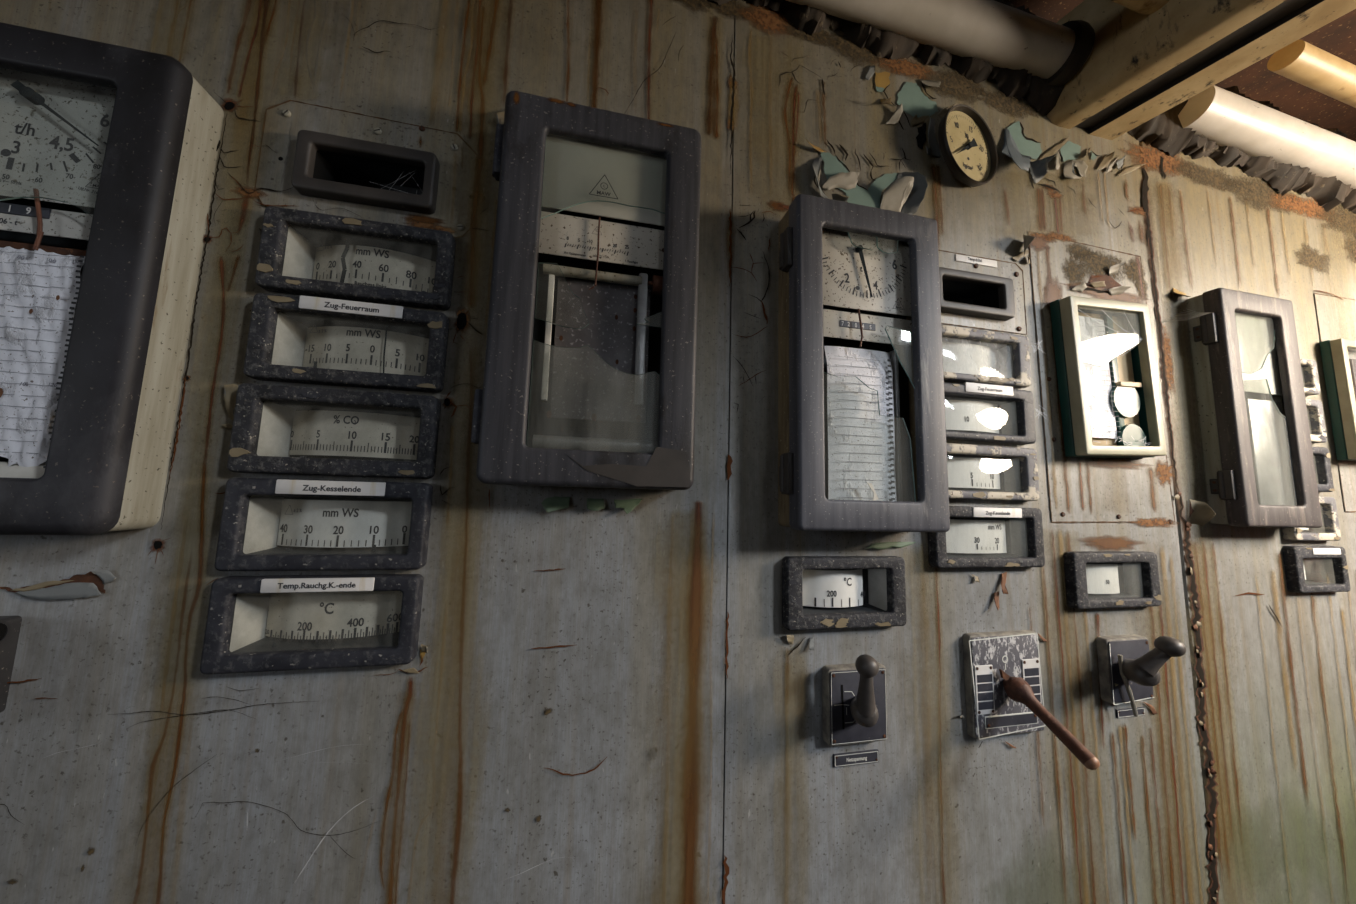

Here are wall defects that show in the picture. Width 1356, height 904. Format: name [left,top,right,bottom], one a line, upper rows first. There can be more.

corrosion [222,0,519,307]
peeling [806,139,928,215]
peeling [865,66,958,157]
peeling [1002,121,1145,189]
peeling [1071,262,1131,295]
peeling [0,570,116,600]
corrosion [137,257,239,904]
corrosion [380,679,413,904]
corrosion [683,502,702,904]
corrosion [932,165,1203,904]
corrosion [1190,546,1242,869]
corrosion [1273,555,1307,794]